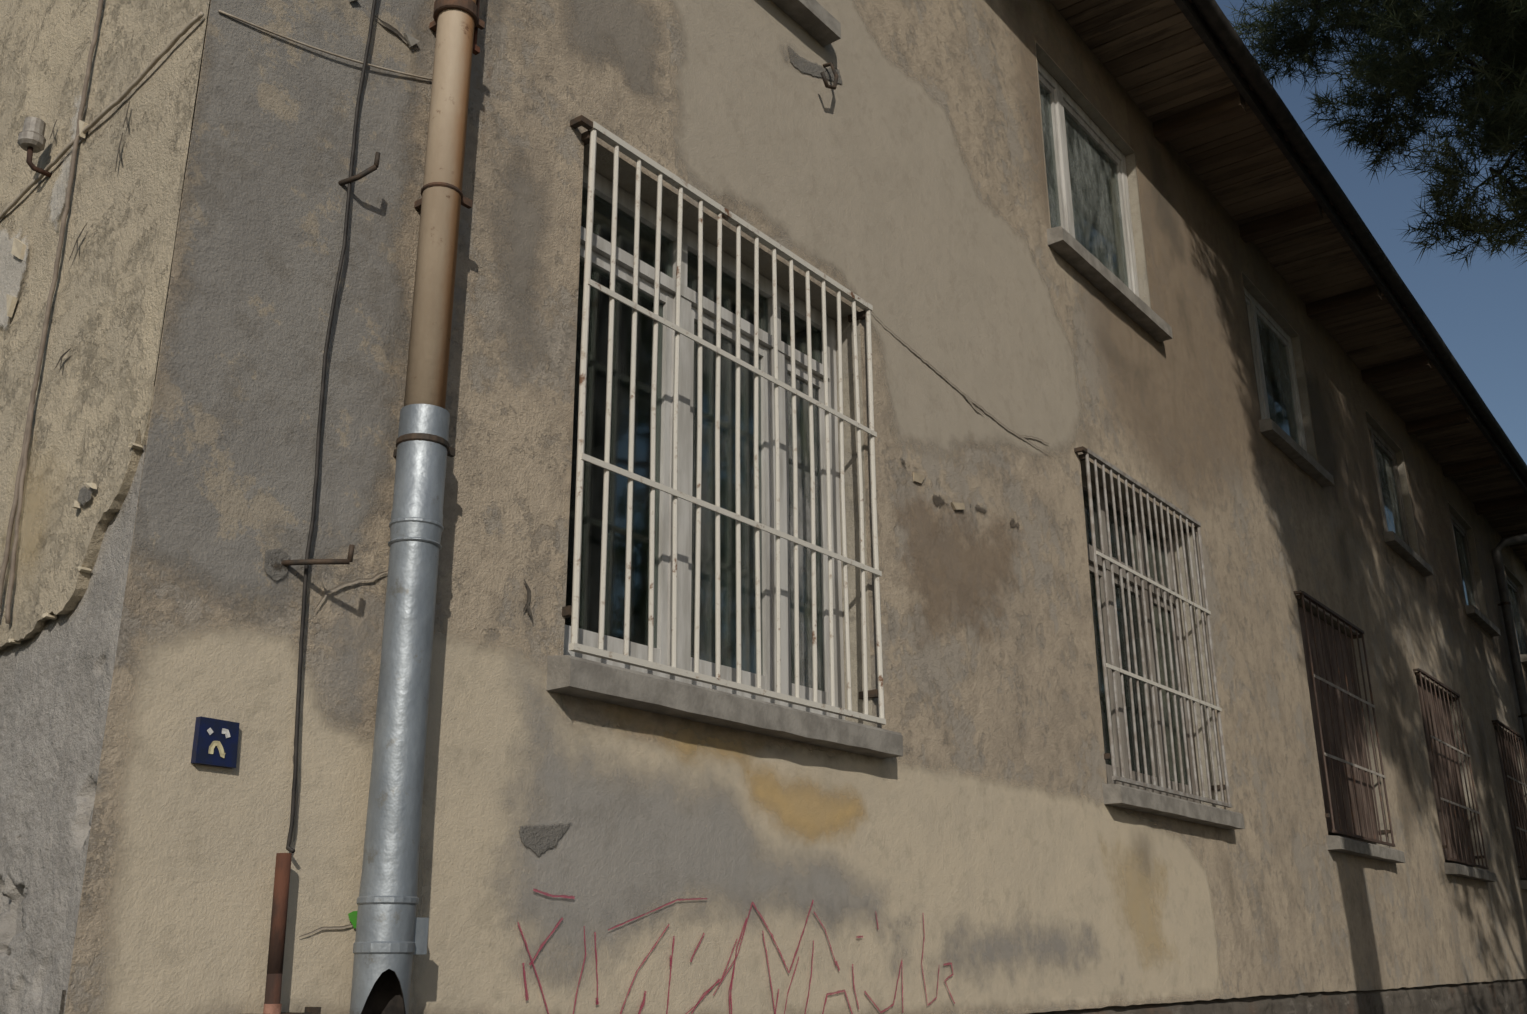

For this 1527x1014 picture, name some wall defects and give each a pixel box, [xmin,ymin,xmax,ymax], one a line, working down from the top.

flaking render [0,442,146,1014]
flaking render [519,822,571,857]